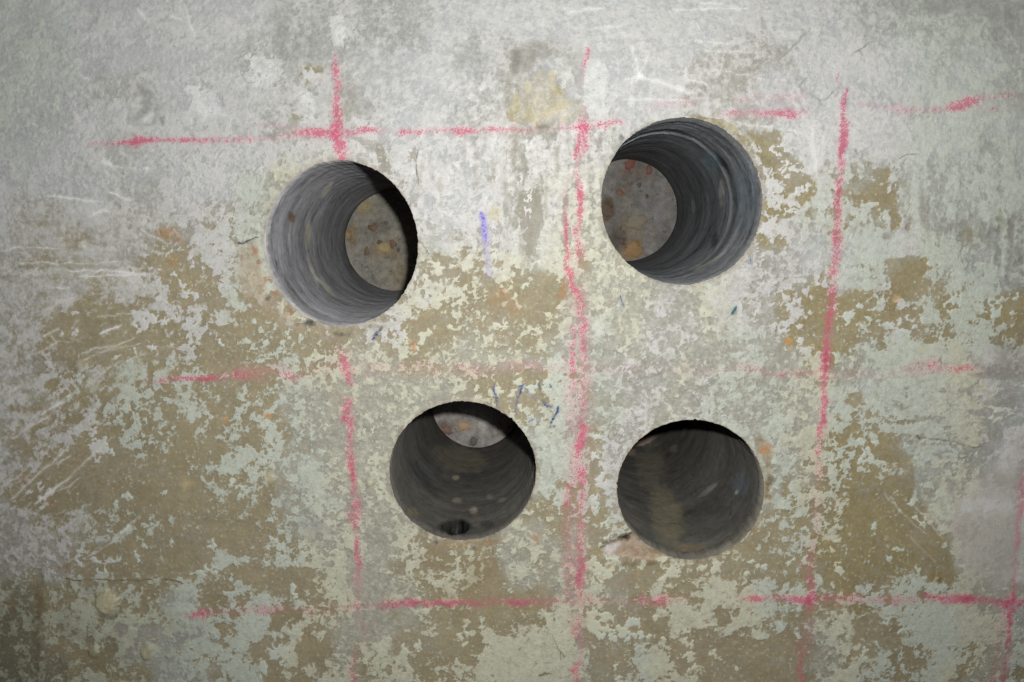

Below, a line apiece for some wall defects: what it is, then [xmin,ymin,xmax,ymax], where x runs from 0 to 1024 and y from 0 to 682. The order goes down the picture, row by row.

peeling [599,114,818,287]
peeling [849,168,896,212]
peeling [882,254,933,288]
peeling [40,297,179,367]
peeling [786,282,975,352]
peeling [981,287,1024,326]
peeling [845,391,867,410]
peeling [386,367,550,552]
peeling [9,424,326,607]
peeling [581,419,960,682]
peeling [248,633,328,682]
peeling [391,605,485,659]